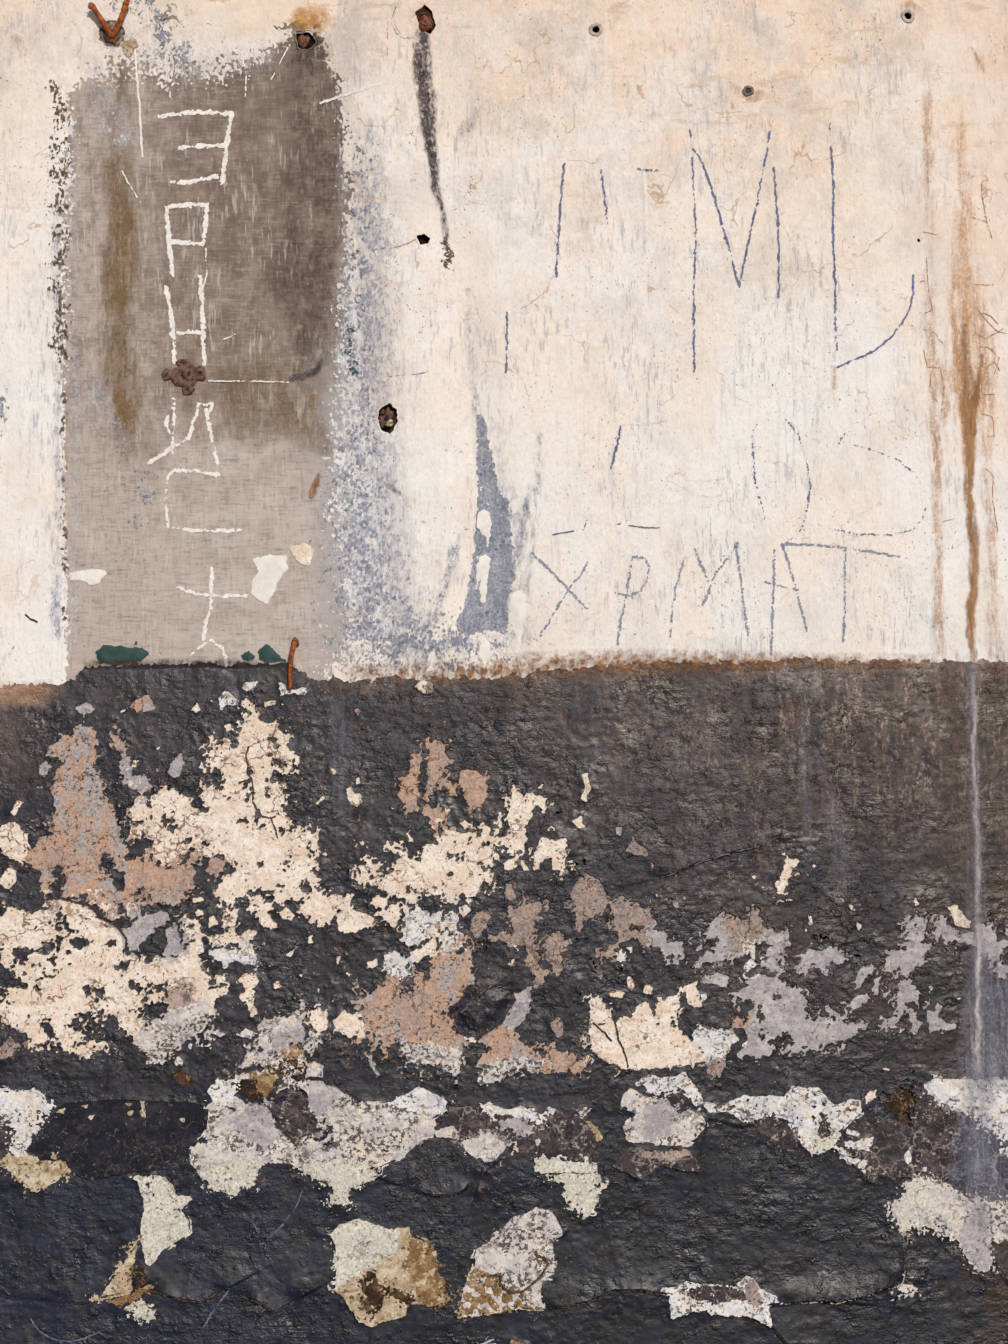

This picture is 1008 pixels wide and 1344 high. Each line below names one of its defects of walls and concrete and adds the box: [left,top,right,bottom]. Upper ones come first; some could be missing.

rust [924,102,932,183]
rust [929,201,995,662]
peeling [0,680,1008,1328]
damp [939,670,1008,1177]